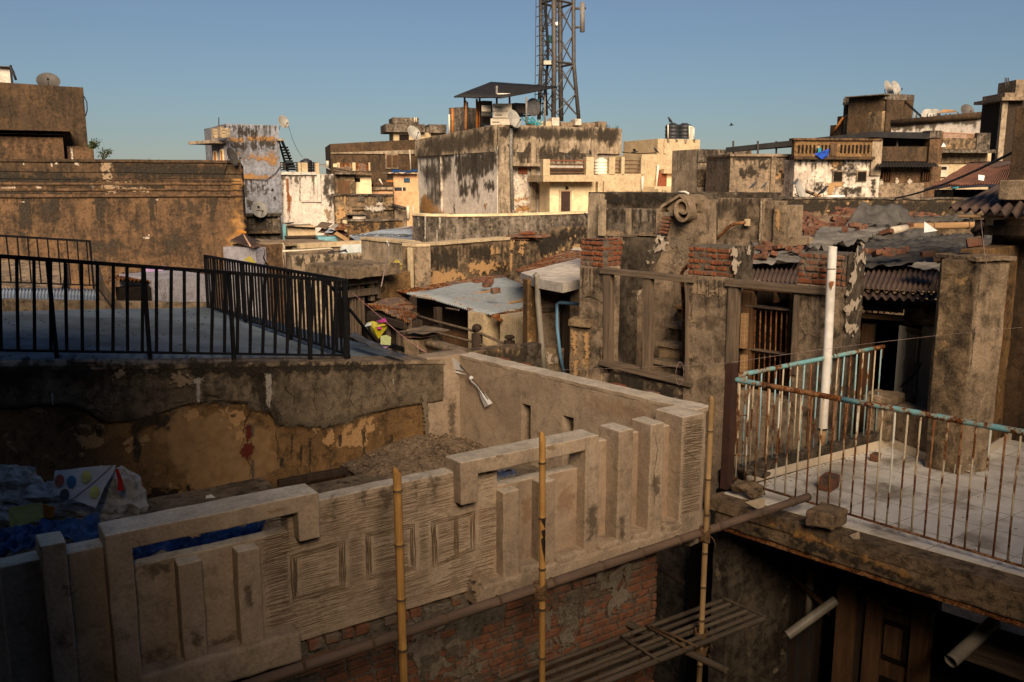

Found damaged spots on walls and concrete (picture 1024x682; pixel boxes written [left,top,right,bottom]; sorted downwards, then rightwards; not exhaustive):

leakage [0,162,269,255]
peeling [229,136,277,200]
leakage [415,125,621,269]
leakage [604,139,965,271]
peeling [431,240,527,285]
leakage [618,285,636,352]
peeling [843,242,868,337]
peeling [219,404,246,441]
crack [166,376,398,478]
peeling [322,416,375,461]